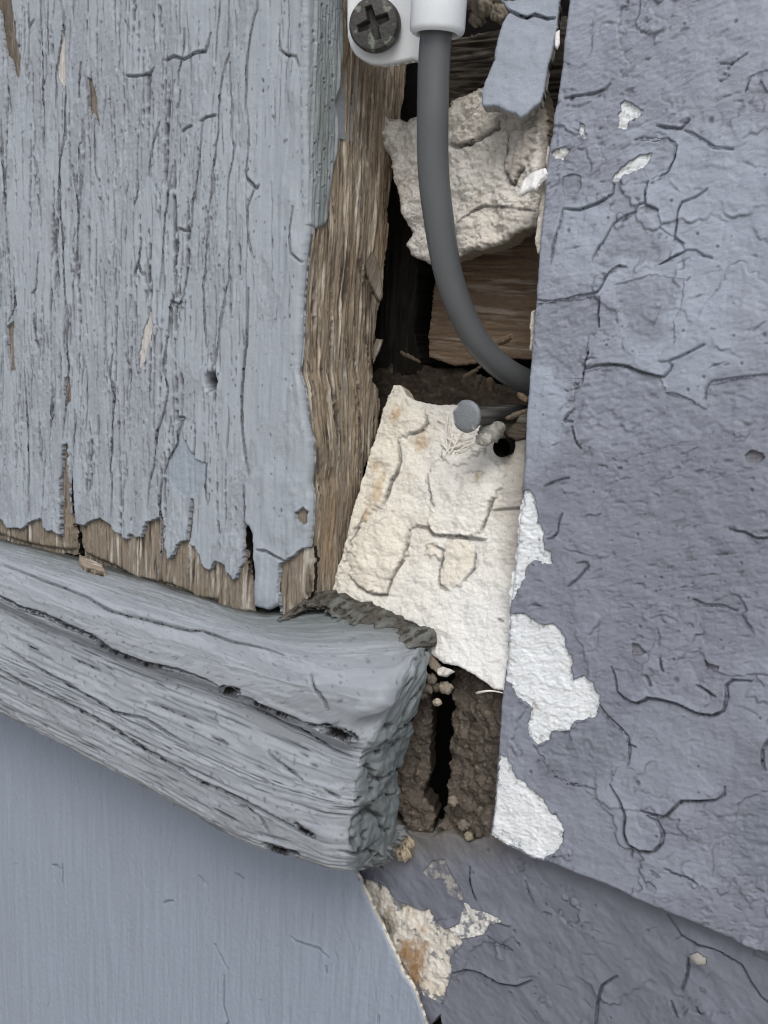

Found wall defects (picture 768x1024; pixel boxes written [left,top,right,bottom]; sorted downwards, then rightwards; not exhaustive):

peeling [0,0,21,77]
crack [8,3,116,519]
crack [126,0,259,581]
crack [537,118,732,326]
peeling [0,444,261,611]
crack [0,564,282,655]
peeling [280,546,320,615]
crack [350,475,520,596]
peeling [506,490,631,788]
crack [0,597,358,857]
peeling [492,755,565,860]
peeling [363,859,501,1002]